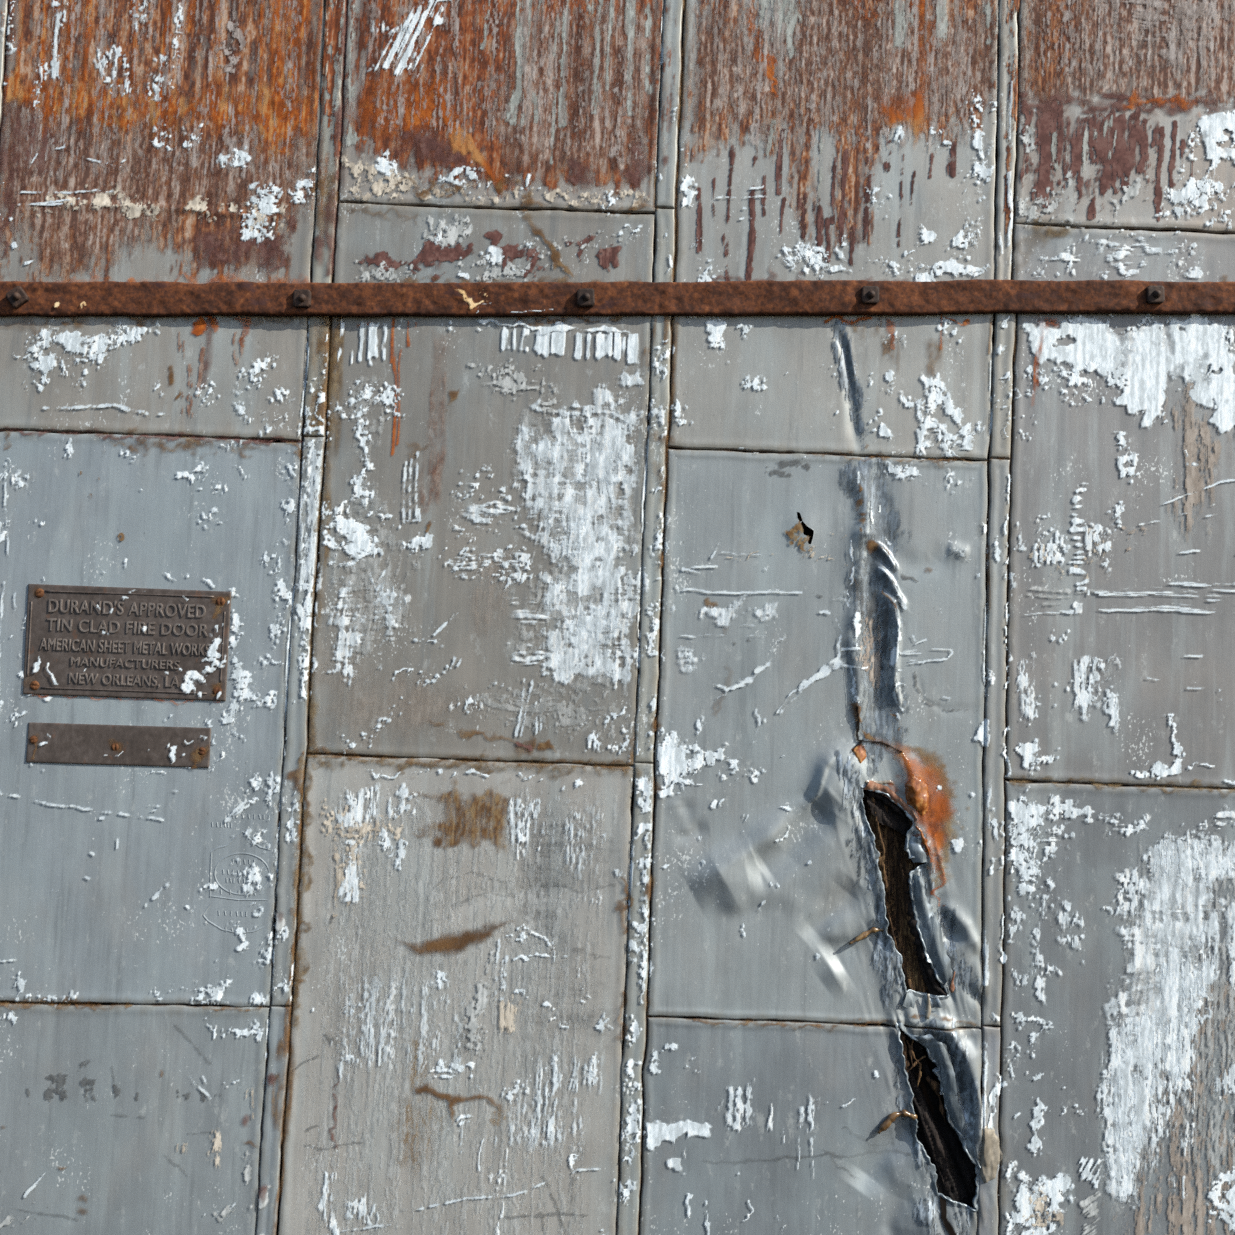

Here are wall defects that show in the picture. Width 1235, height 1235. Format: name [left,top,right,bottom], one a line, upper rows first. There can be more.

peeling [336,124,649,282]
rust [0,0,1235,284]
rust [653,315,676,440]
peeling [831,313,1235,539]
rust [314,484,331,560]
peeling [0,656,58,727]
peeling [150,316,776,1171]
rust [518,739,634,777]
rust [890,748,953,900]
peeling [969,431,1149,1130]
peeling [1131,714,1215,780]
rust [261,667,508,1196]